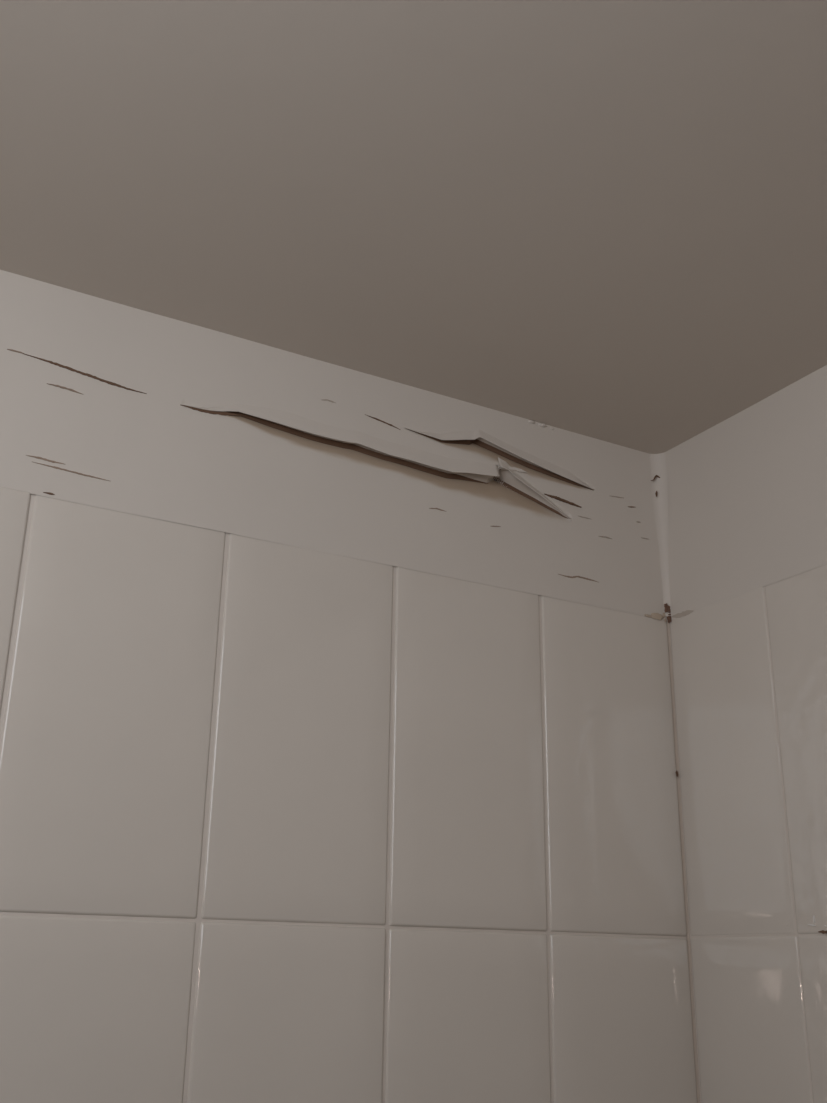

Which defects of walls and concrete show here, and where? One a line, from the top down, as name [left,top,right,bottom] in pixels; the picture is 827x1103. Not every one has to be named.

crack [7,349,147,394]
peeling [181,404,594,523]